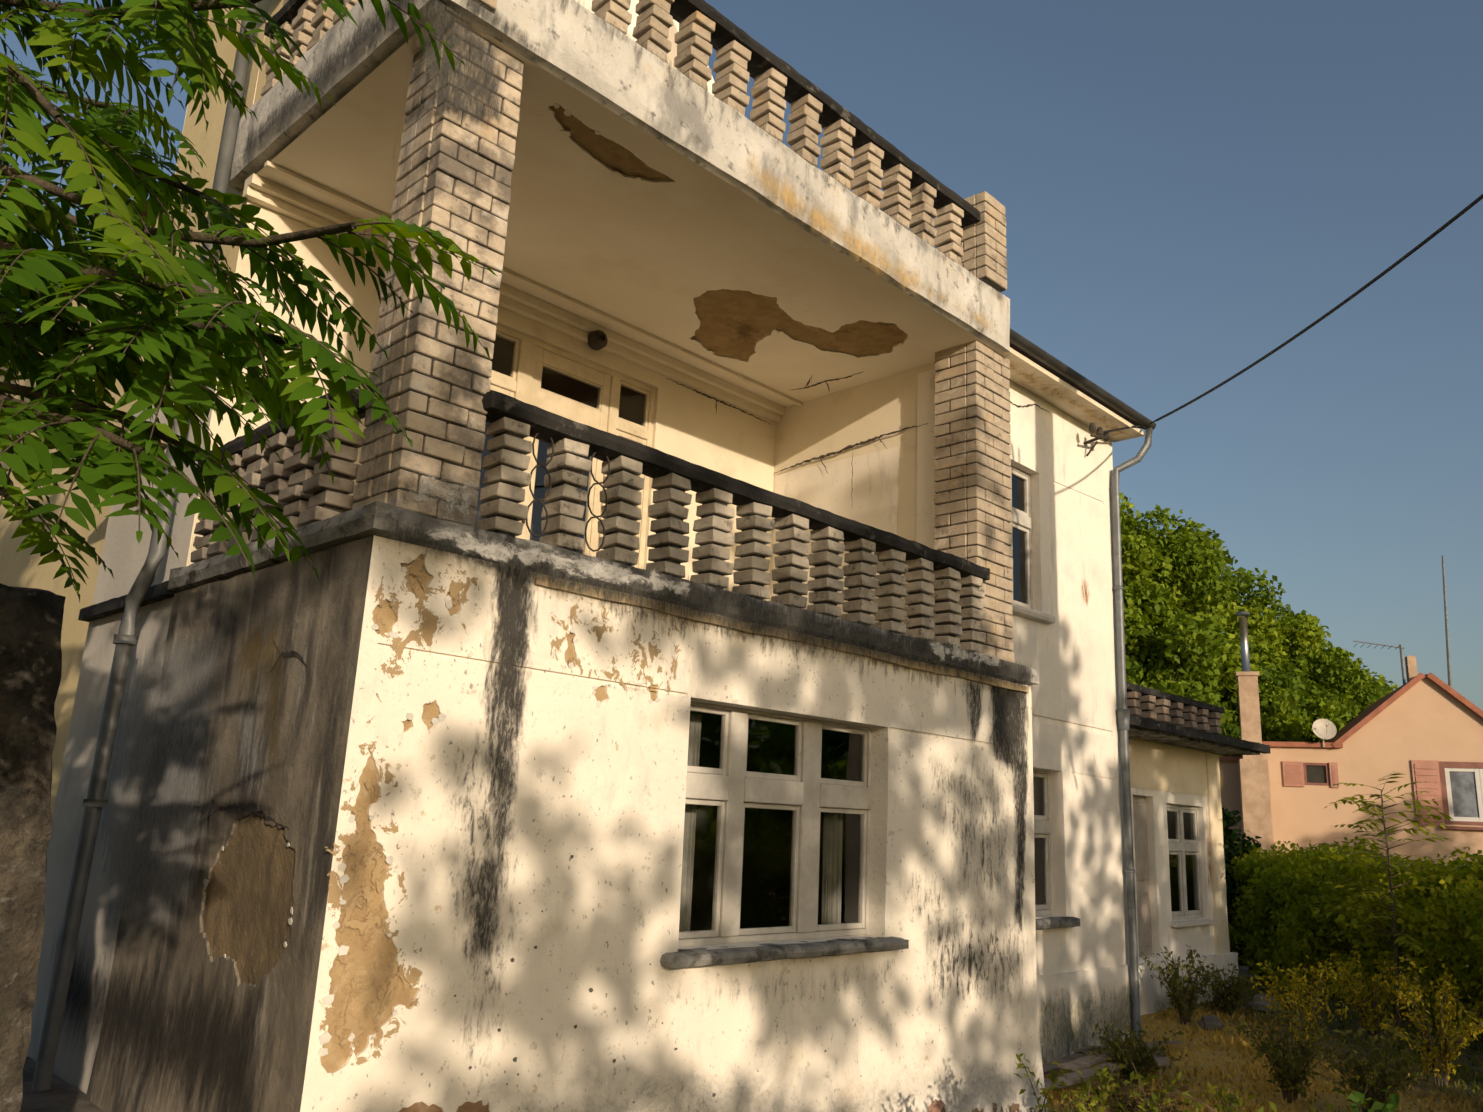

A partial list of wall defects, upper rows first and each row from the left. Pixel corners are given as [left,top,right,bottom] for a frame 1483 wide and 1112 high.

damp [414,475,473,514]
crack [773,423,928,497]
peeling [371,554,481,702]
peeling [550,596,680,708]
damp [102,641,218,933]
damp [396,522,1032,1006]
peeling [318,718,425,1073]
damp [55,939,252,1112]
peeling [399,1098,493,1112]